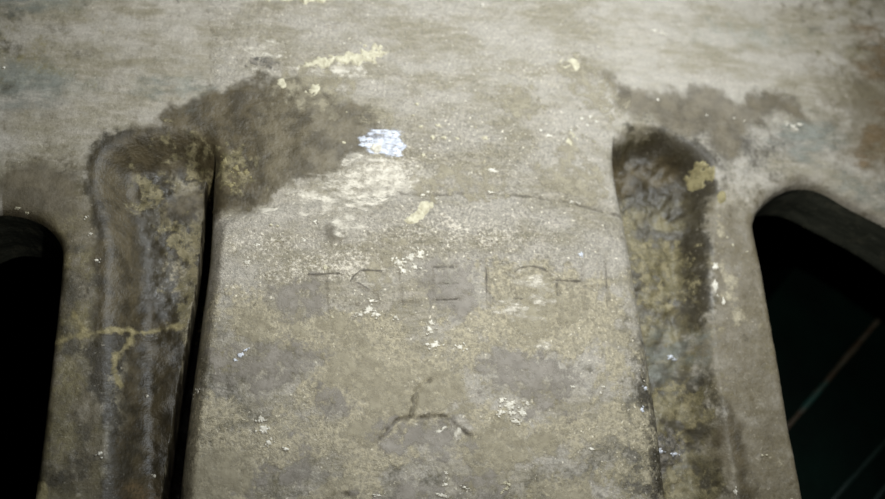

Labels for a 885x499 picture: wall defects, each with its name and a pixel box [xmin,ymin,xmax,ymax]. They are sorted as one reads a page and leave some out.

damp [618,88,826,161]
damp [612,149,679,202]
damp [89,40,419,499]
crack [55,312,183,387]
damp [714,417,758,499]